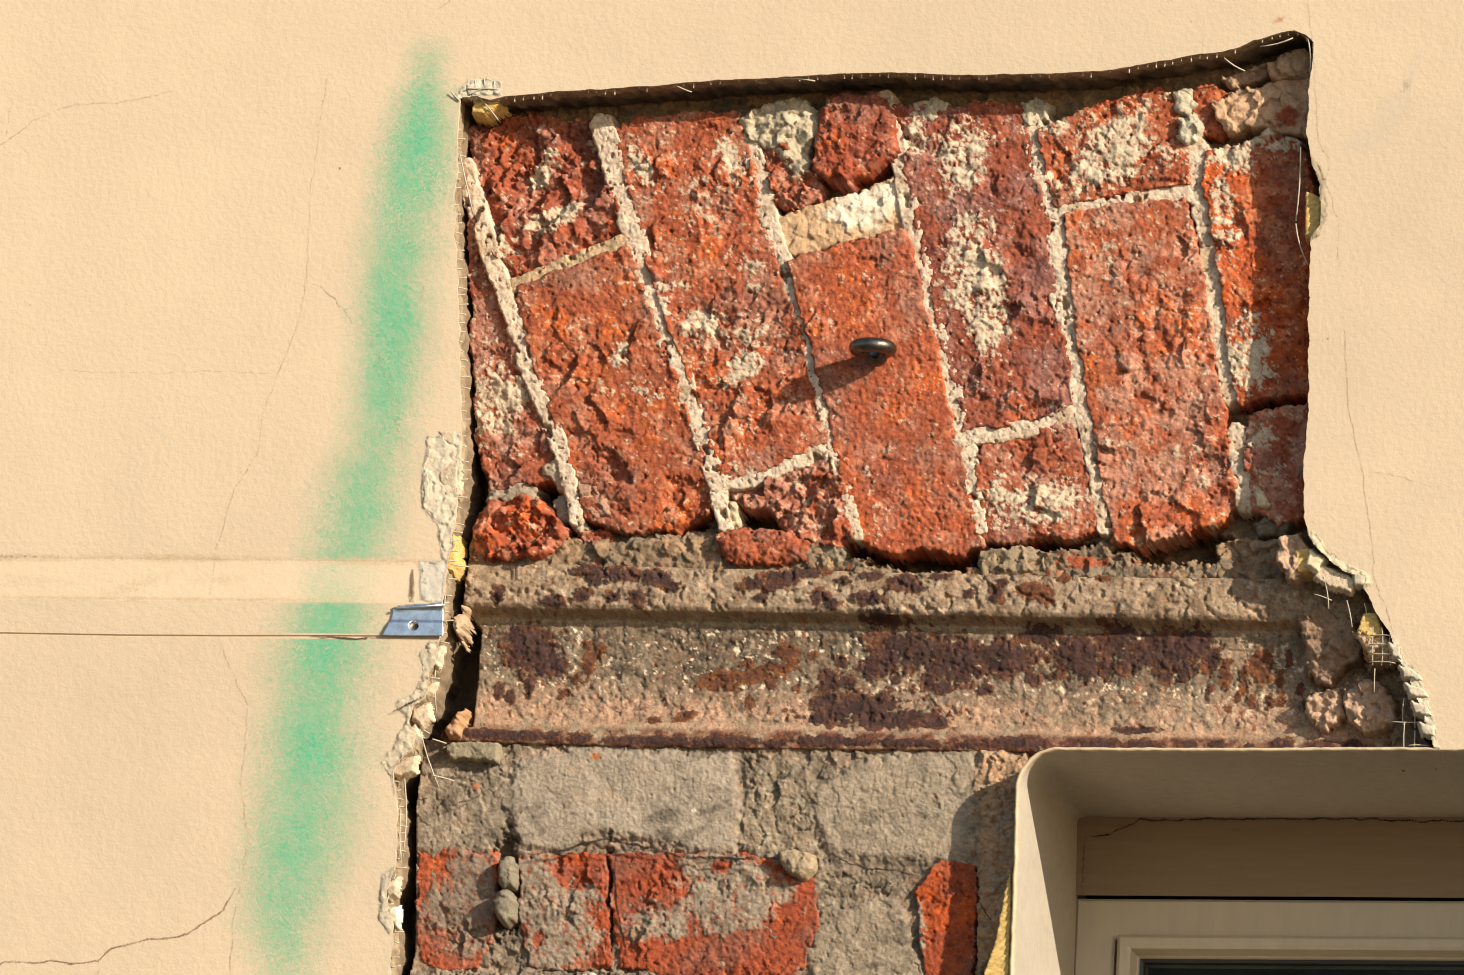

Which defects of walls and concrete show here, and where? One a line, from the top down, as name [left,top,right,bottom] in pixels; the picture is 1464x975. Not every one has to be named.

spalling [454,77,503,104]
spalling [1310,154,1328,241]
spalling [417,431,464,603]
spalling [1305,531,1374,597]
spalling [382,639,447,792]
peeling [446,741,503,766]
spalling [1387,637,1442,749]
crack [0,644,248,972]
spalling [378,867,403,935]